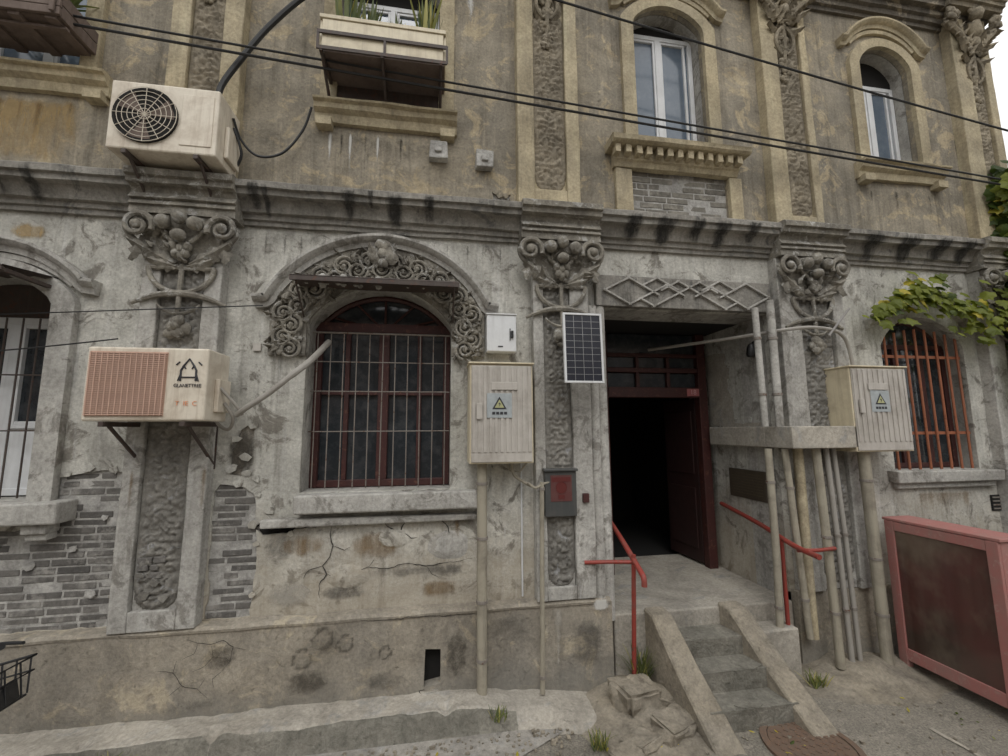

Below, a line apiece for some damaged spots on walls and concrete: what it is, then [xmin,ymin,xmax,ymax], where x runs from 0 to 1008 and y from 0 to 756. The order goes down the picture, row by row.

leakage [19,166,42,201]
flaking render [0,463,122,634]
flaking render [205,422,296,619]
crack [269,525,356,598]
crack [361,558,471,576]
crack [358,613,474,621]
leakage [292,627,353,690]